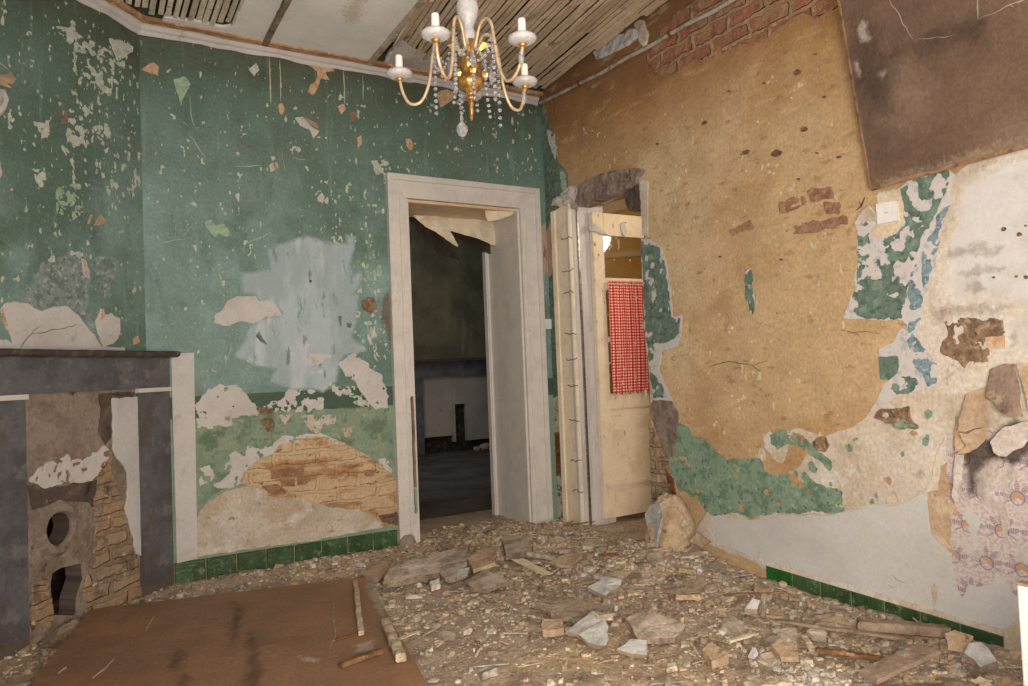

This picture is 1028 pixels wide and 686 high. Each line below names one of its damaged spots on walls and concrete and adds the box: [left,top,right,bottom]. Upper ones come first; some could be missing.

flaking render [646,0,839,76]
crack [890,2,952,40]
crack [977,0,1024,19]
flaking render [195,65,497,527]
peeling [409,210,515,259]
peeling [494,96,568,434]
peeling [587,205,692,446]
peeling [736,269,758,314]
peeling [778,170,1028,550]
flaking render [83,448,142,614]
peeling [639,409,859,551]
flaking render [31,581,54,627]